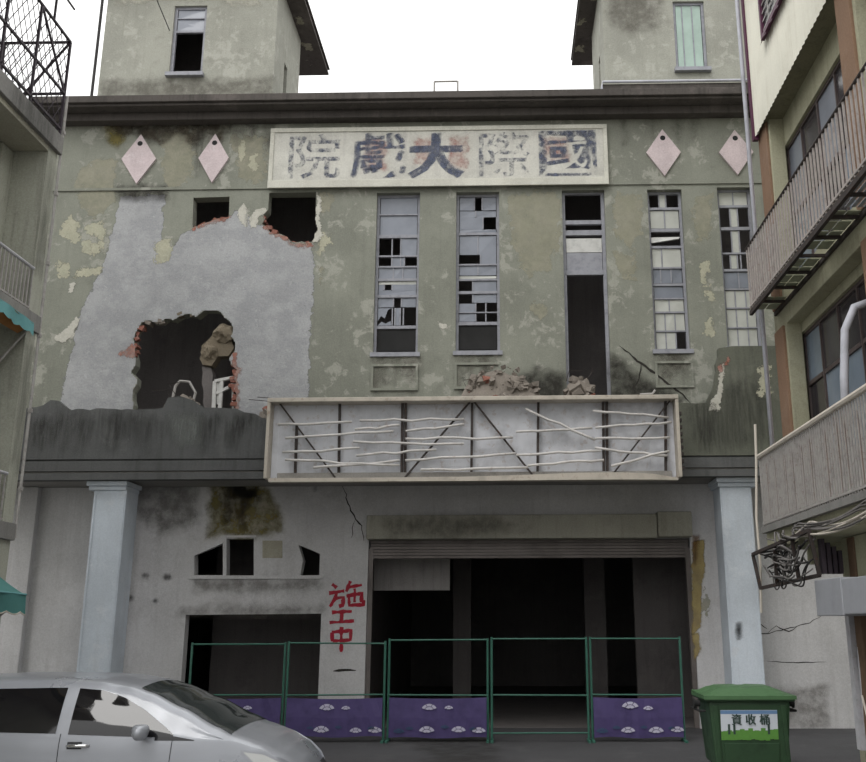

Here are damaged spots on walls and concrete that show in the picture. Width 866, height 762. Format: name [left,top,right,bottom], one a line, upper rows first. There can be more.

spalling [54,130,337,416]
peeling [699,260,716,304]
crack [620,346,689,401]
spalling [709,357,730,411]
crack [342,486,364,540]
crack [761,616,821,634]